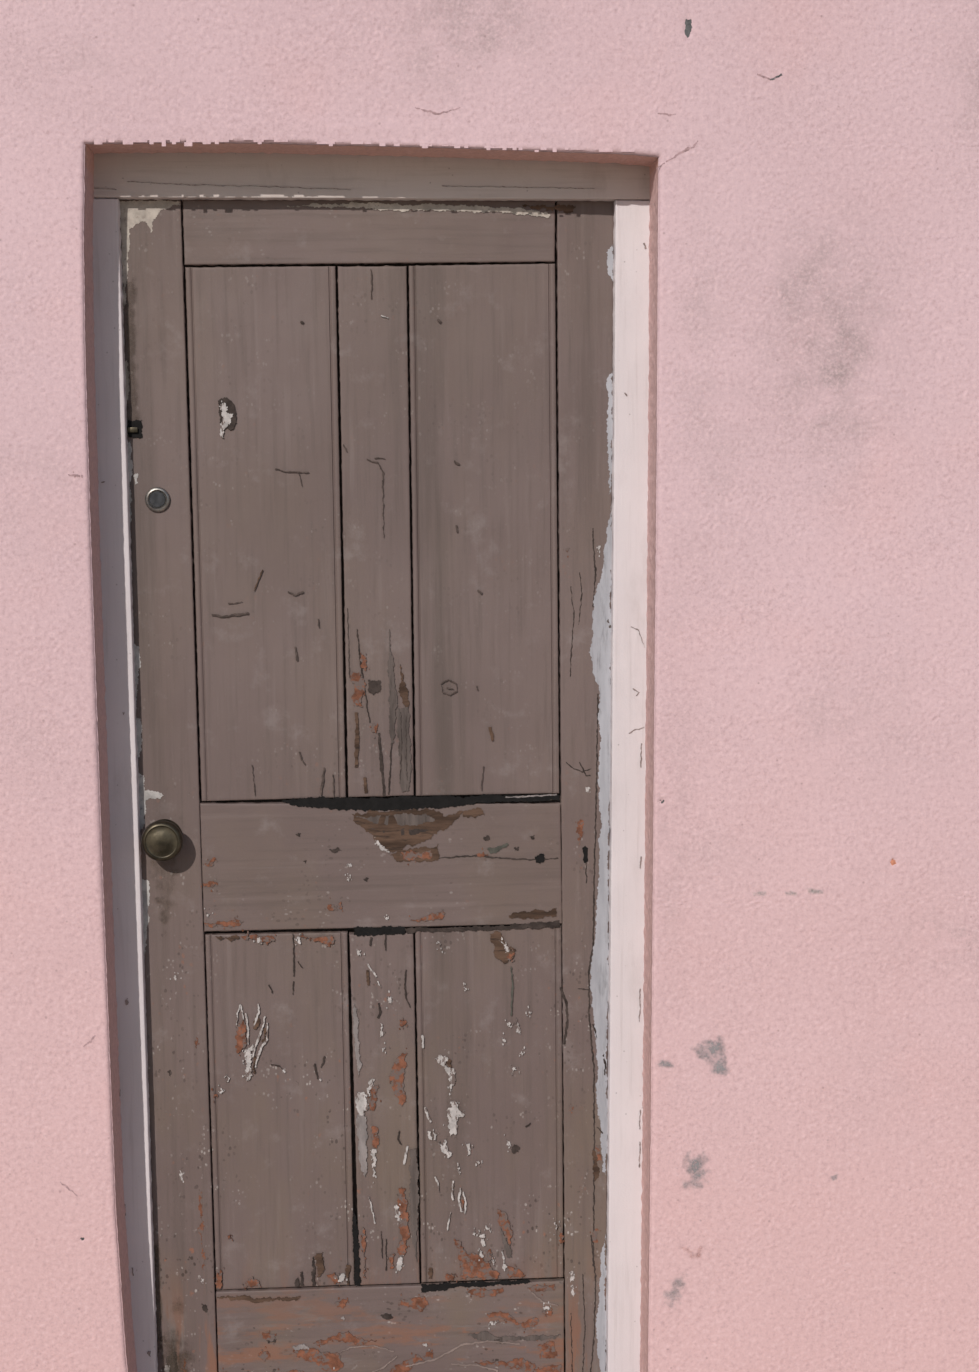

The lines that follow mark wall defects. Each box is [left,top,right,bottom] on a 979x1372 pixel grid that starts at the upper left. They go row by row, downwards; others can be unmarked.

peeling [218,397,237,438]
peeling [350,629,484,865]
peeling [201,857,276,945]
damp [704,1041,726,1073]
peeling [198,908,576,1372]
peeling [592,1145,602,1181]